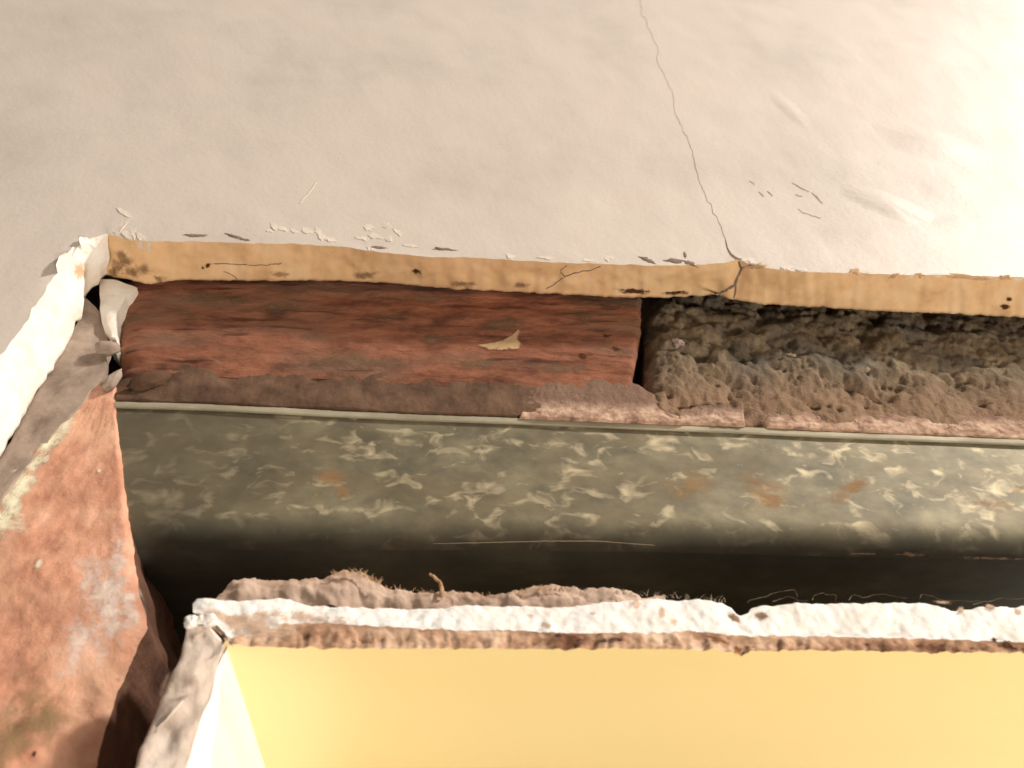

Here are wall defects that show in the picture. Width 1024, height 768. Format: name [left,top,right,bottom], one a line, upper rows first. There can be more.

crack [640,3,762,298]
spalling [638,252,698,268]
peeling [742,257,809,273]
crack [546,265,601,289]
spalling [848,268,1024,282]